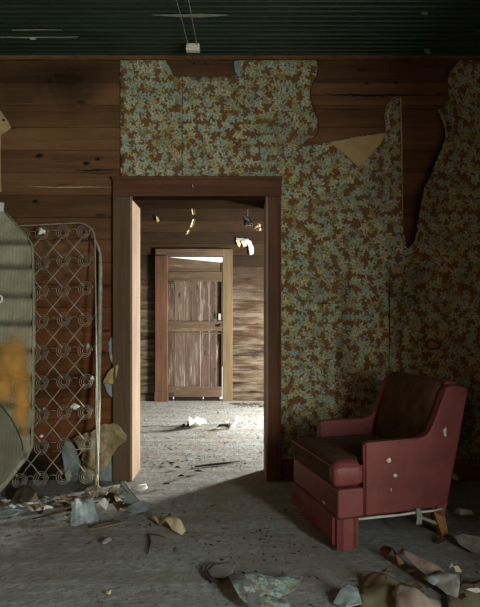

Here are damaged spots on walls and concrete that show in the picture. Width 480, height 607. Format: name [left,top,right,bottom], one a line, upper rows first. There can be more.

crack [322,94,436,110]